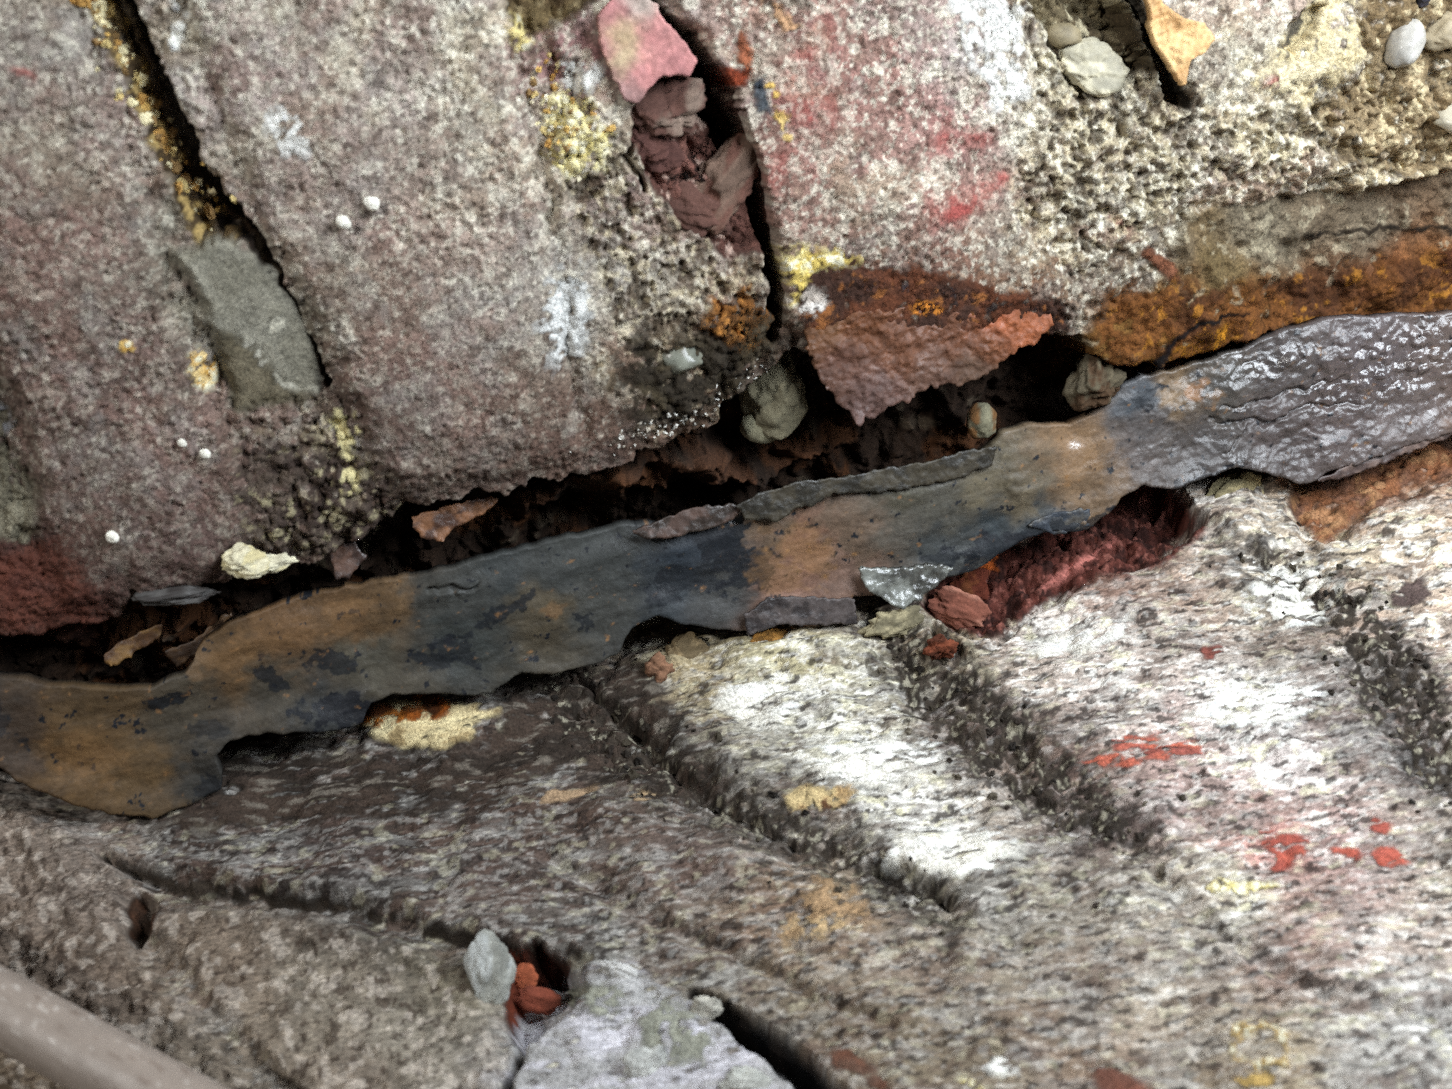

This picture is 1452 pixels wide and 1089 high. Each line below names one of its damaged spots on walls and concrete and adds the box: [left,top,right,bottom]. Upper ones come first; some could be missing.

spalling [507,0,761,258]
corrosion [704,287,774,353]
corrosion [792,256,1073,427]
corrosion [1095,246,1452,365]
corrosion [411,496,498,542]
corrosion [633,446,998,539]
corrosion [1028,507,1093,535]
corrosion [1289,433,1452,544]
corrosion [329,541,367,580]
corrosion [104,612,232,668]
corrosion [743,596,858,635]